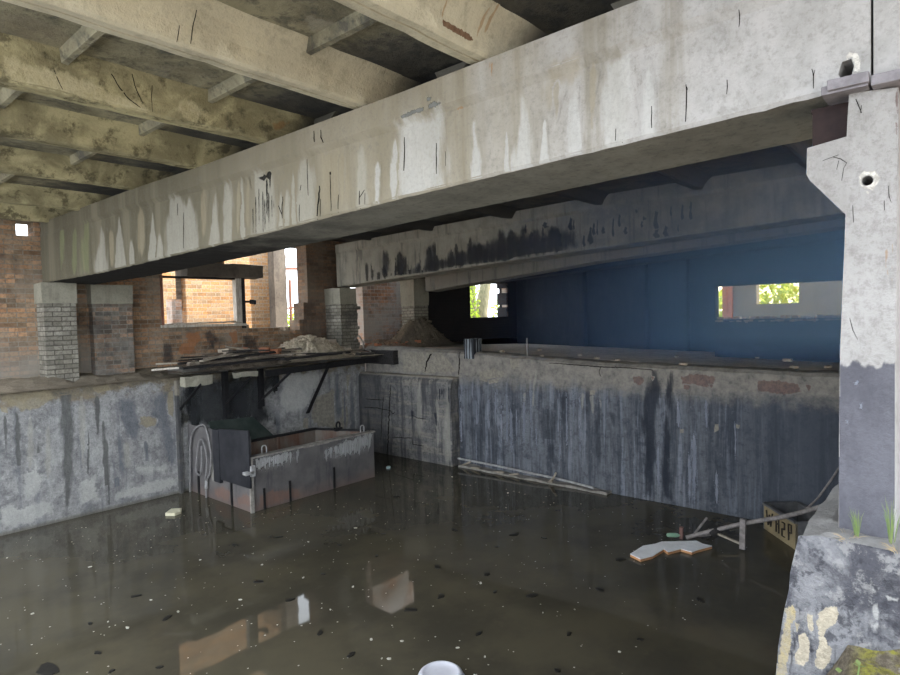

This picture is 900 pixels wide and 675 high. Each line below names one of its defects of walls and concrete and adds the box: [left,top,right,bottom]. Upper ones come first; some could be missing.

leakage [0,0,80,48]
crack [111,74,153,112]
leakage [92,90,454,273]
spalling [857,169,885,195]
leakage [365,227,559,281]
leakage [0,384,197,536]
leakage [637,366,681,504]
leakage [688,435,697,497]
peeling [776,602,842,675]
spalling [868,582,900,634]